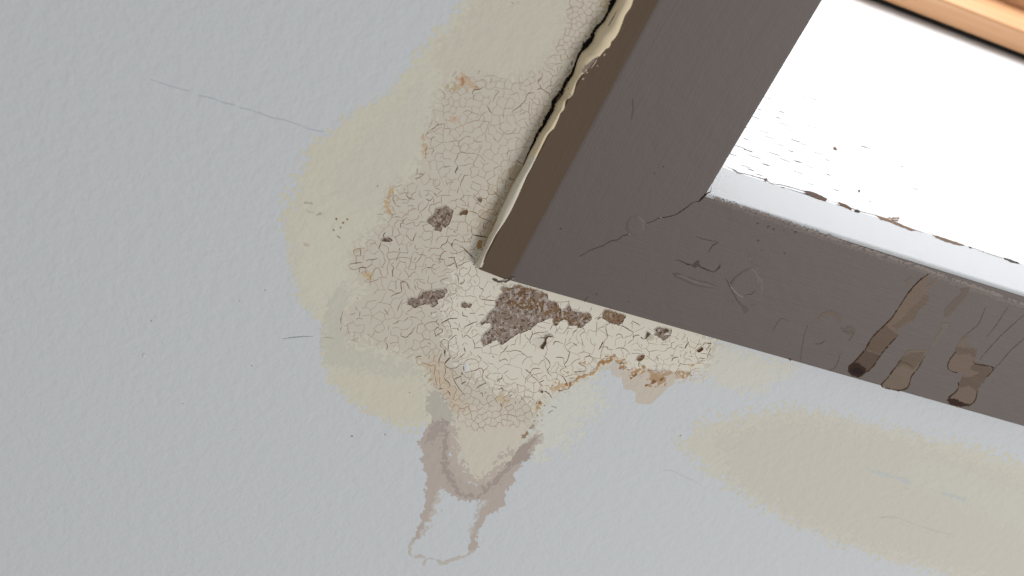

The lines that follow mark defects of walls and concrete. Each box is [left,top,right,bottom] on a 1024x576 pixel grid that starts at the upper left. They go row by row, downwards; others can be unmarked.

spalling [427,197,483,232]
crack [325,0,724,462]
spalling [407,287,449,308]
spalling [480,284,629,347]
damp [270,0,1024,576]